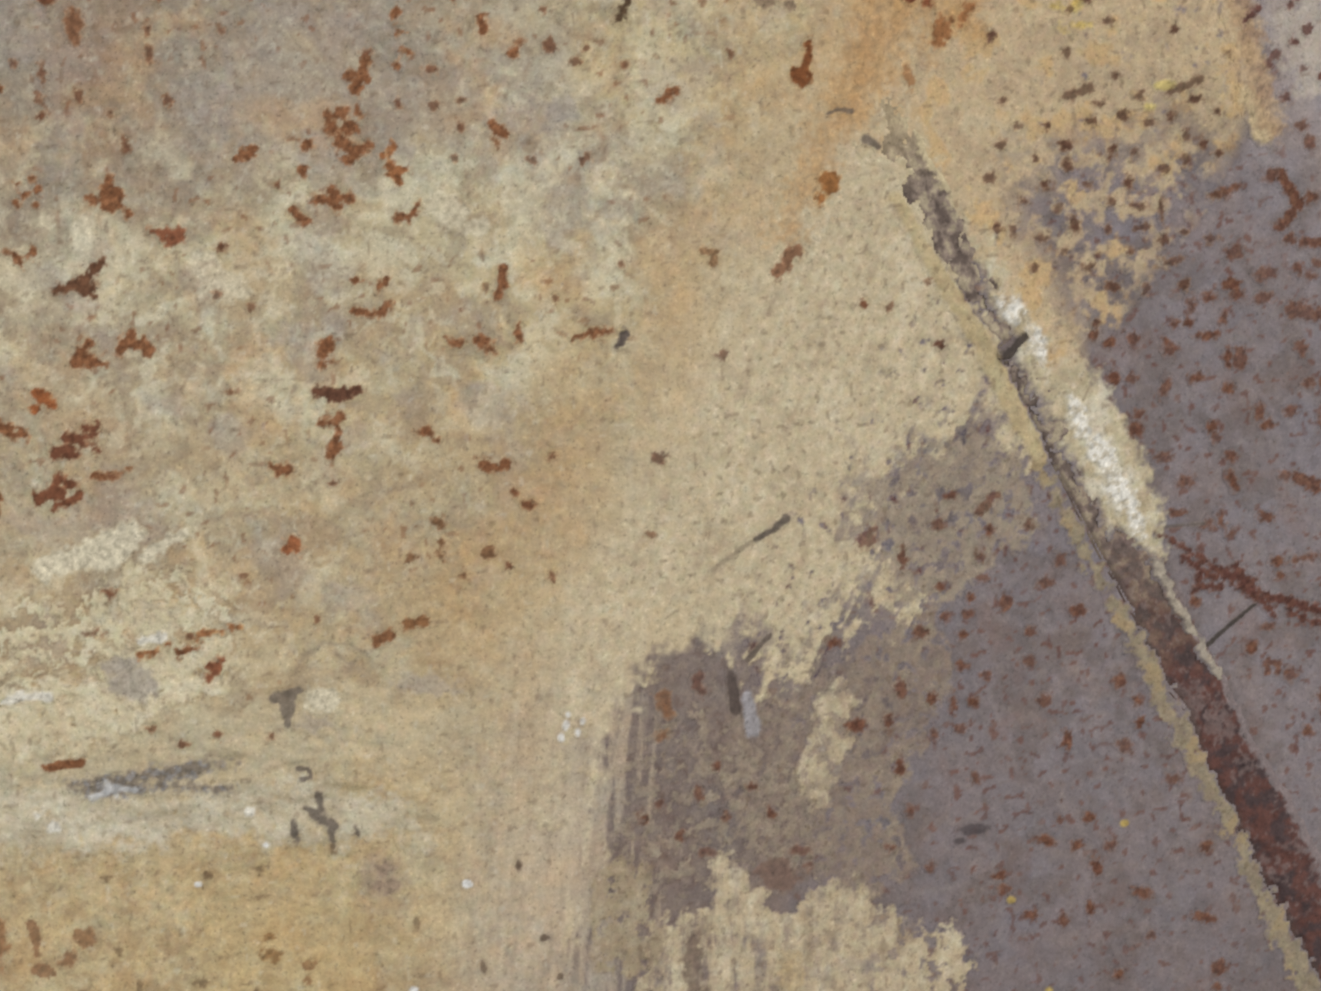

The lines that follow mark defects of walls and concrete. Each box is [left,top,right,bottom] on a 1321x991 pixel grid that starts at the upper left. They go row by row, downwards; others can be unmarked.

corrosion [270,0,441,231]
corrosion [81,106,189,250]
corrosion [47,250,111,310]
corrosion [346,273,399,322]
corrosion [66,325,158,373]
corrosion [0,385,136,515]
corrosion [307,332,369,489]
leakage [974,261,1226,680]
corrosion [134,621,246,687]
corrosion [369,612,439,650]
leakage [724,668,764,740]
crack [1153,530,1321,631]